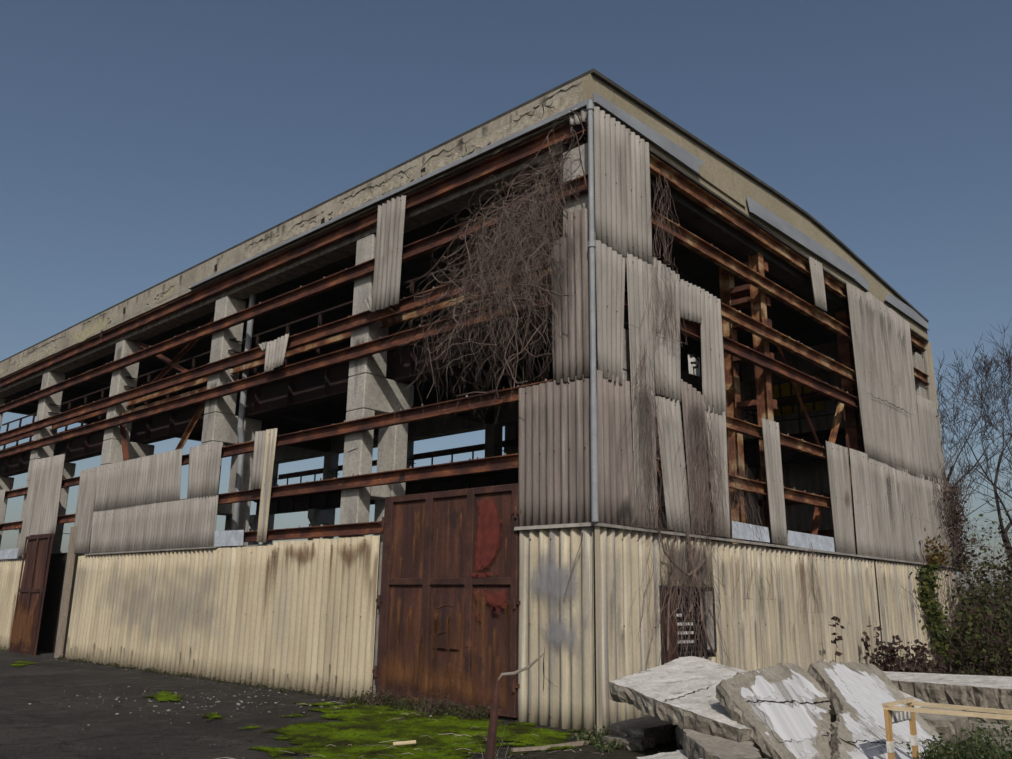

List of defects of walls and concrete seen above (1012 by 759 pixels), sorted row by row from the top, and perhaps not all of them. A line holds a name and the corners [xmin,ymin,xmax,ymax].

crack [514,82,581,123]
crack [245,141,468,249]
rust [10,594,35,649]
rust [381,599,479,700]
crack [747,699,830,747]
crack [825,732,944,759]